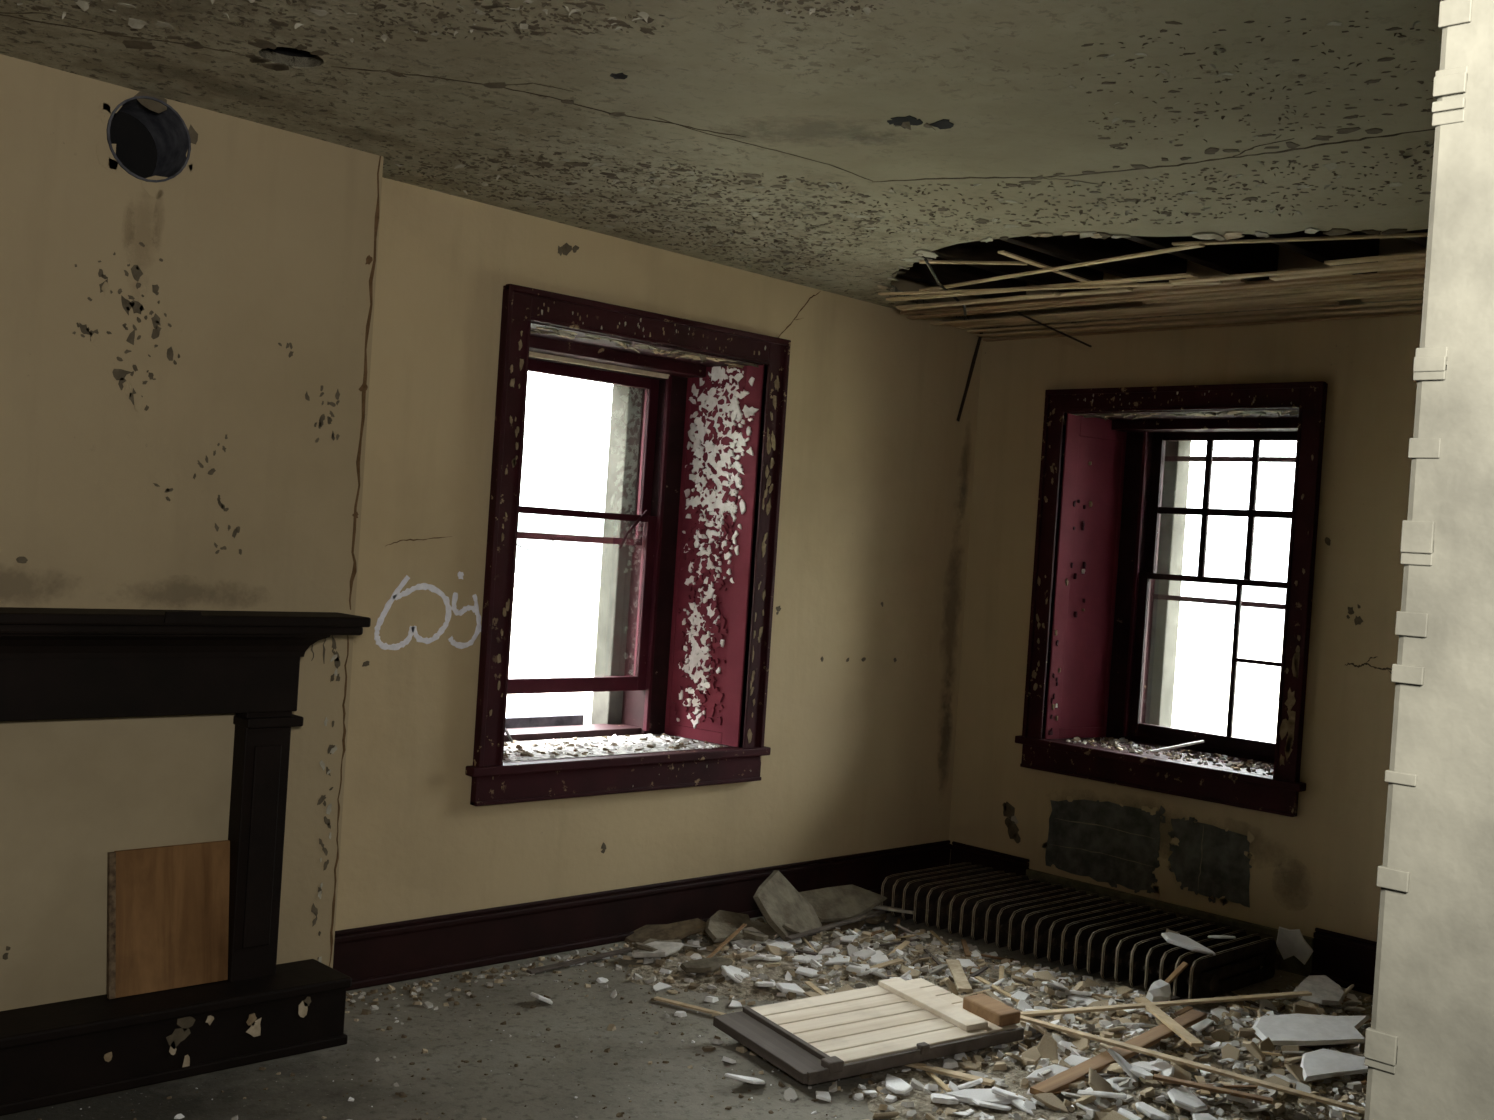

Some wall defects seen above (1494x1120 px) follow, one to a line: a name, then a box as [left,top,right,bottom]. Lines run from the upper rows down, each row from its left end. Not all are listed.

peeling [73,252,180,412]
peeling [503,302,781,771]
peeling [1042,796,1255,908]